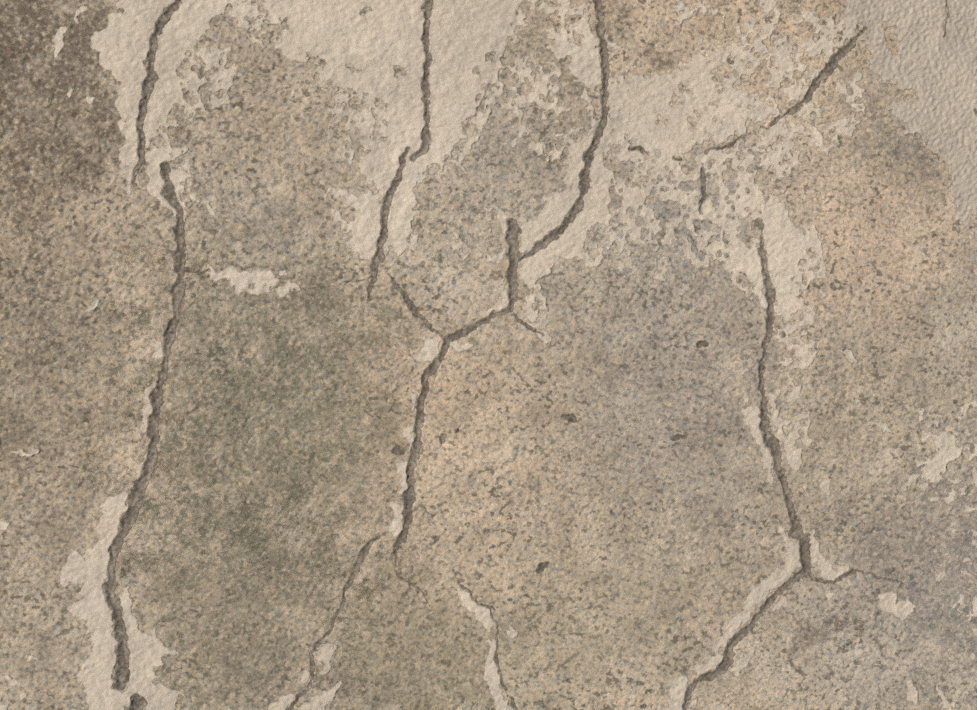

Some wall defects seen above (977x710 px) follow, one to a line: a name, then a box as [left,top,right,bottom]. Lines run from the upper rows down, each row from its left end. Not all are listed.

crack [699,26,867,206]
peeling [91,0,977,485]
crack [104,0,209,710]
crack [287,0,624,710]
peeling [388,426,415,538]
crack [682,219,902,710]
peeling [876,400,977,513]
peeling [47,491,186,710]
peeling [878,590,917,621]
peeling [906,680,918,705]
peeling [936,685,955,710]
peeling [930,528,977,636]